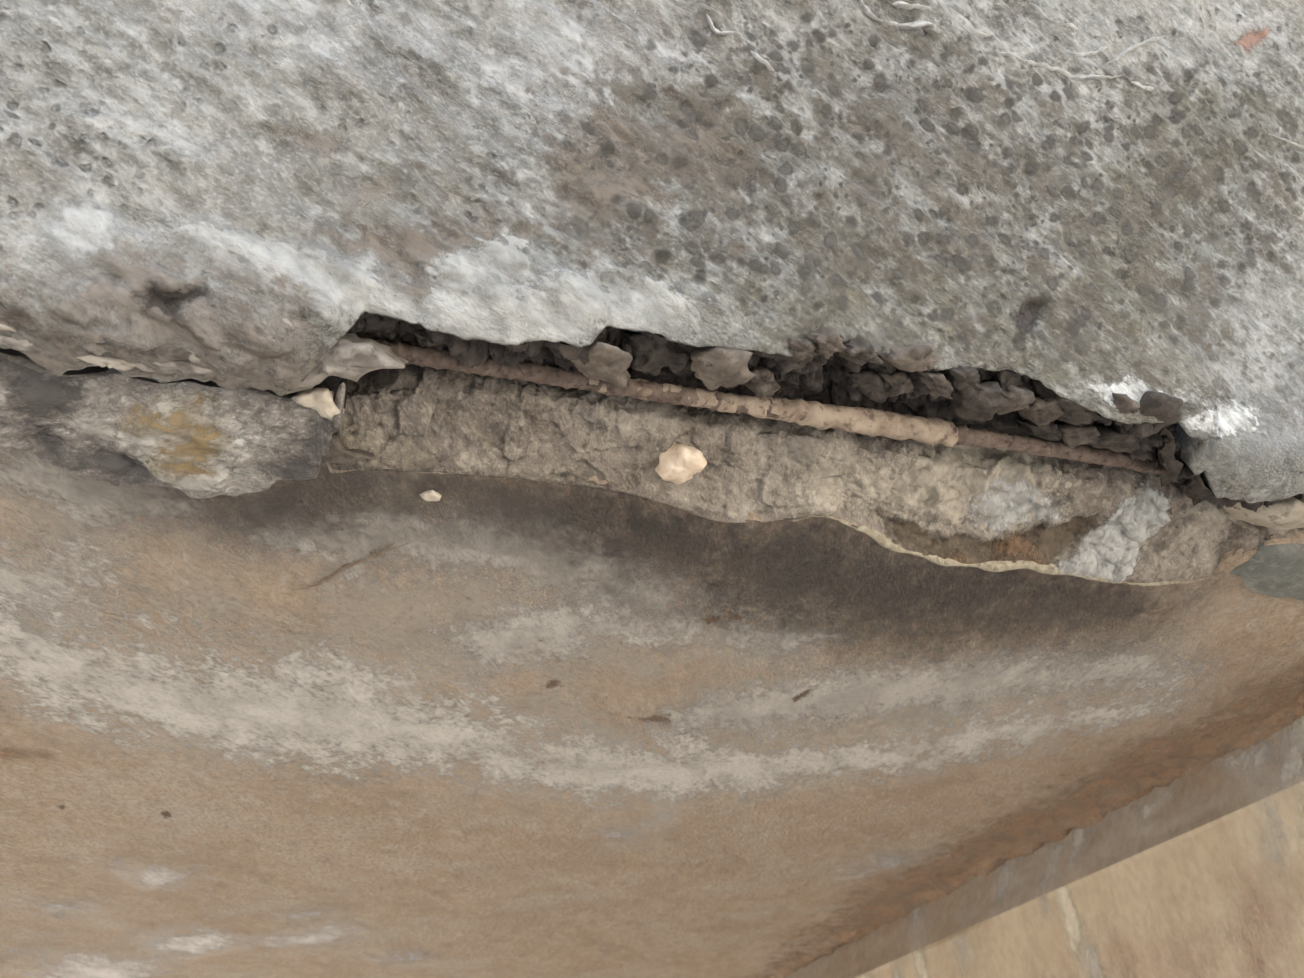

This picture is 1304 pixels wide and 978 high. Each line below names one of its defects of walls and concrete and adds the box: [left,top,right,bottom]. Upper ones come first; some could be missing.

spalling [803,16,852,42]
spalling [583,123,685,171]
spalling [614,196,659,240]
spalling [657,30,1304,344]
crack [0,348,28,357]
crack [63,306,348,409]
spalling [291,312,1304,586]
water stain [0,357,1209,837]